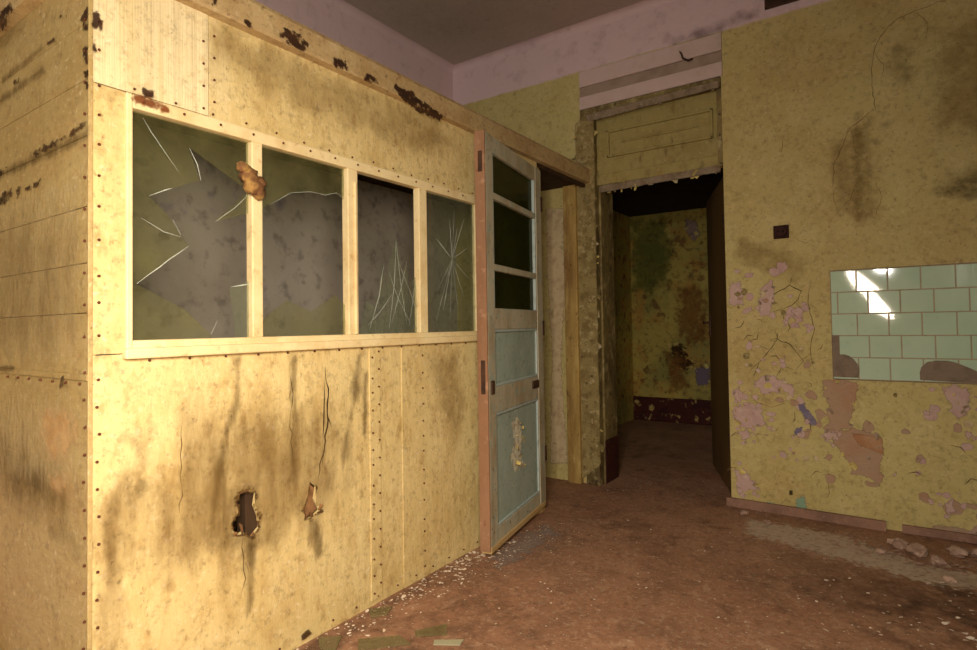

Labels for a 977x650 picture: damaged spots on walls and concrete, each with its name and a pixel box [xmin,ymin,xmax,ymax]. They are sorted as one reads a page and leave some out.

peeling [728,262,788,316]
peeling [732,335,884,487]
peeling [920,360,977,420]
leakage [258,429,300,502]
peeling [918,492,977,535]